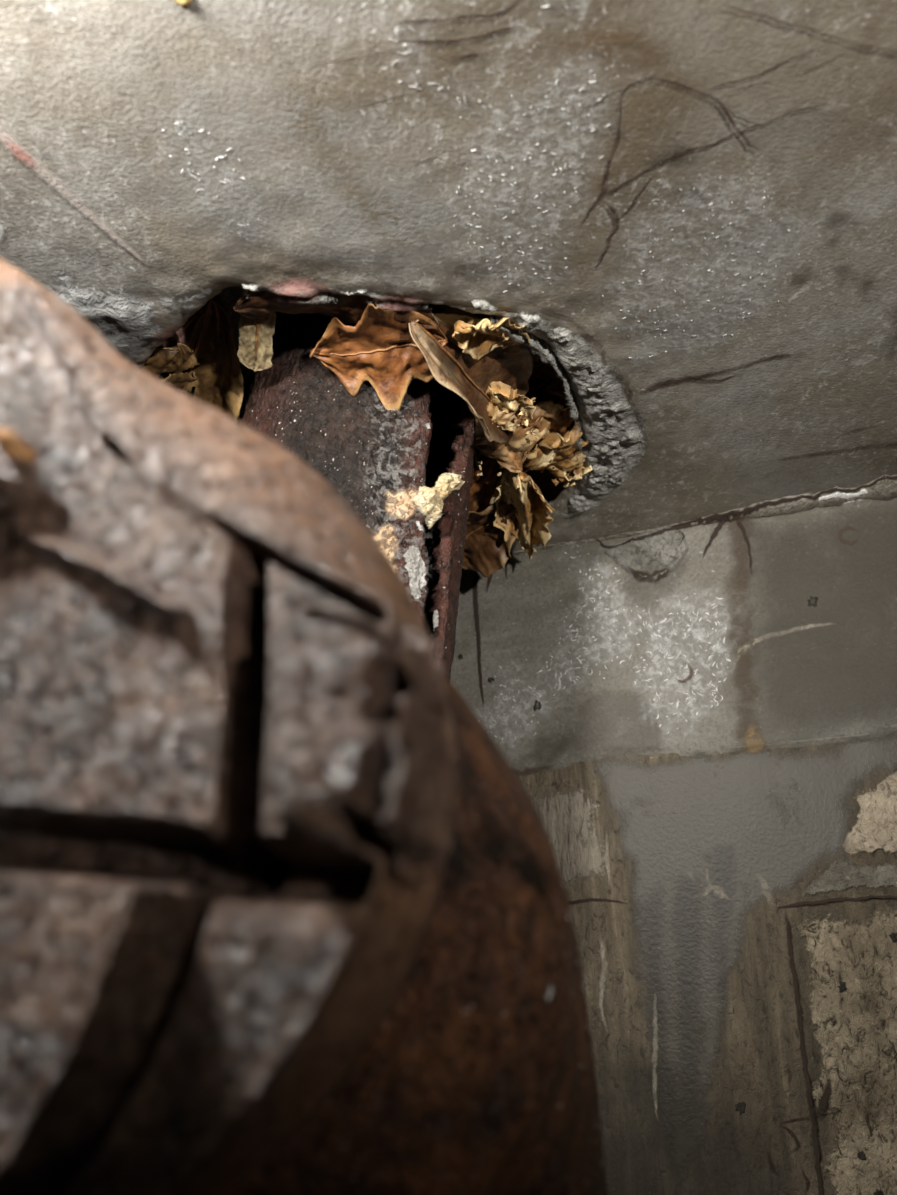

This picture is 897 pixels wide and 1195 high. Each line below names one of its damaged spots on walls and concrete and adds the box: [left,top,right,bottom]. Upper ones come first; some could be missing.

crack [586,8,897,266]
spalling [241,278,649,519]
crack [512,476,897,568]
crack [647,354,792,391]
crack [783,428,897,459]
damp [489,514,897,1195]
peeling [842,771,897,854]
peeling [798,907,897,1195]